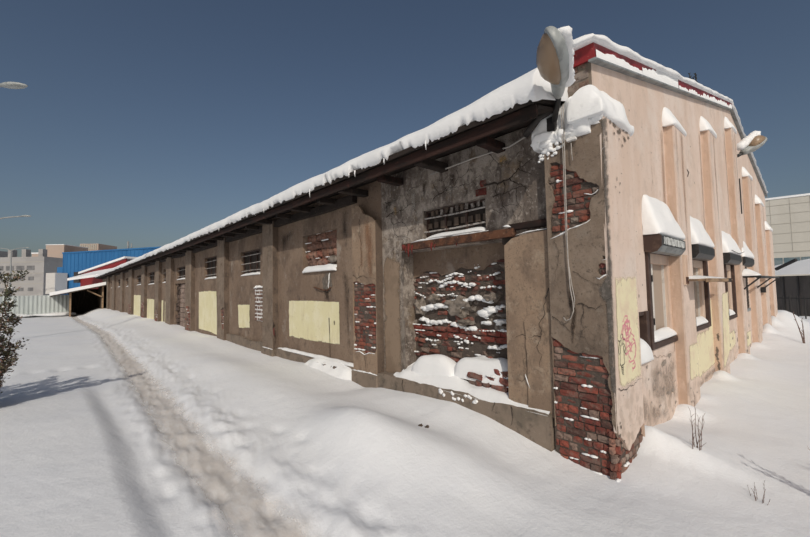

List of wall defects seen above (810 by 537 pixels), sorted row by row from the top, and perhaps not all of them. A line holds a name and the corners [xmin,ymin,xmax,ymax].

crack [385,146,533,254]
spalling [549,164,599,239]
spalling [354,281,376,355]
crack [516,242,602,381]
spalling [552,337,643,482]